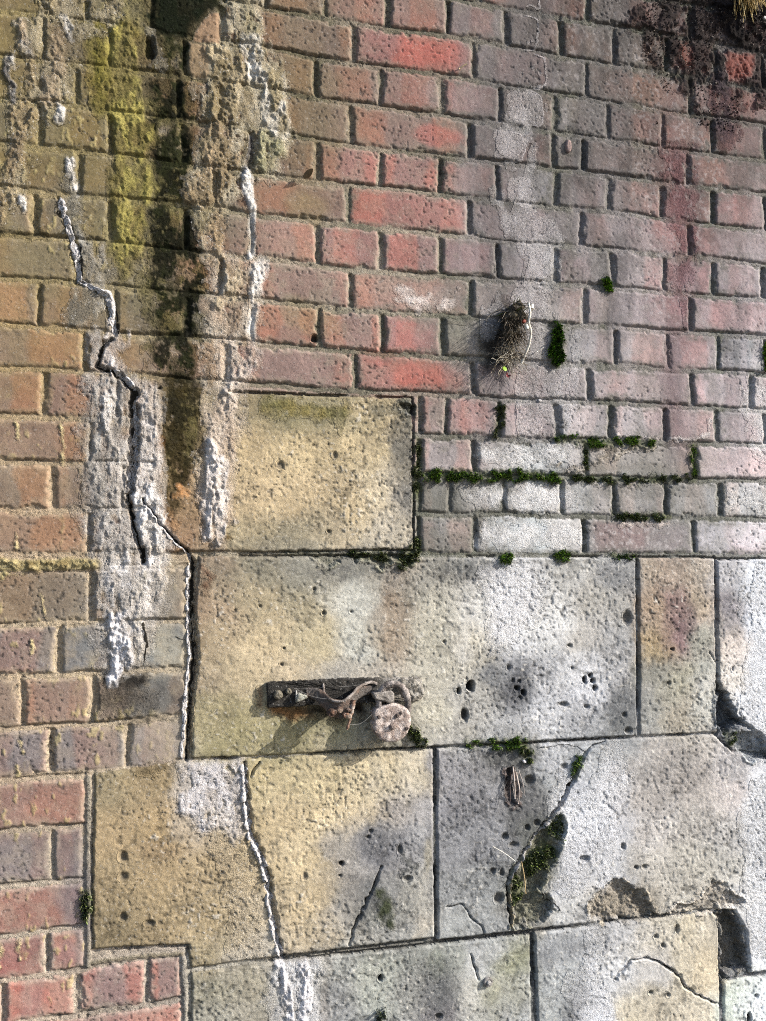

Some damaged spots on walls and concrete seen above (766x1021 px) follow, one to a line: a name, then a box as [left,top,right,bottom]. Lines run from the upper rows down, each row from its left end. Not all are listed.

damp [0,0,126,226]
damp [55,0,299,689]
crack [55,198,200,759]
spalling [622,608,634,627]
spalling [621,711,633,735]
spalling [712,680,766,766]
crack [239,761,283,958]
crack [505,779,572,930]
crack [617,956,717,1003]
spalling [585,864,753,983]